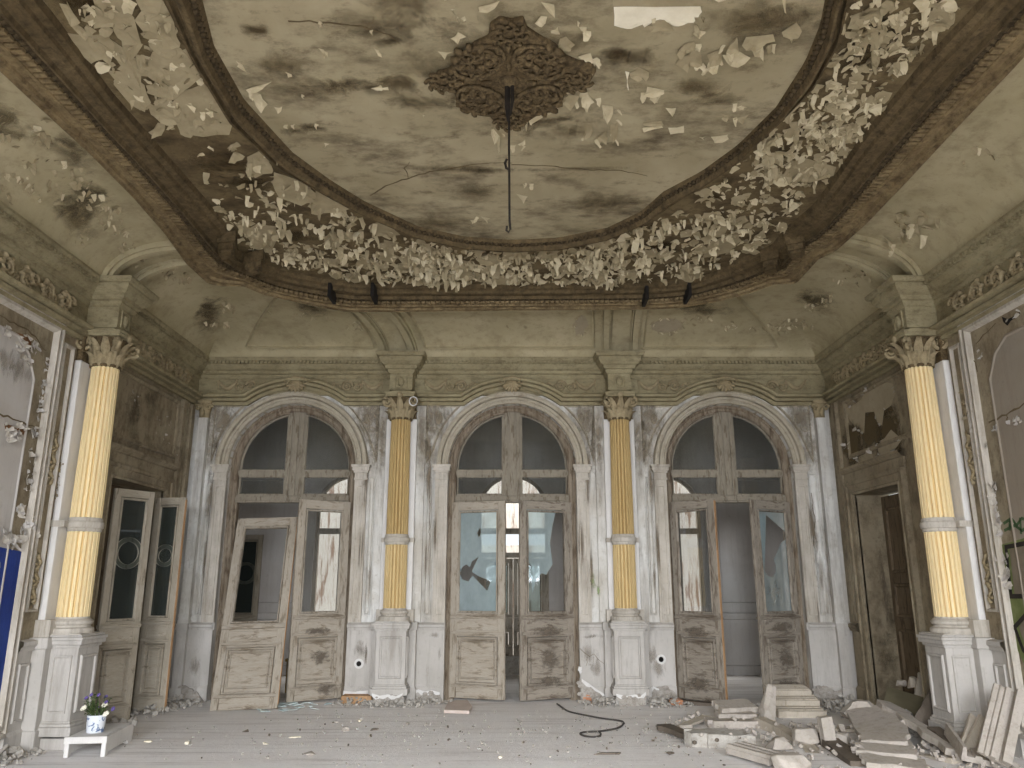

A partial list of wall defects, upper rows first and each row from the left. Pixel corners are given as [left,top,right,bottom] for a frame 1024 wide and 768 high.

peeling [0,116,149,269]
crack [370,163,646,196]
peeling [59,0,960,292]
peeling [0,325,50,491]
flaking render [840,382,901,463]
peeling [0,503,41,551]